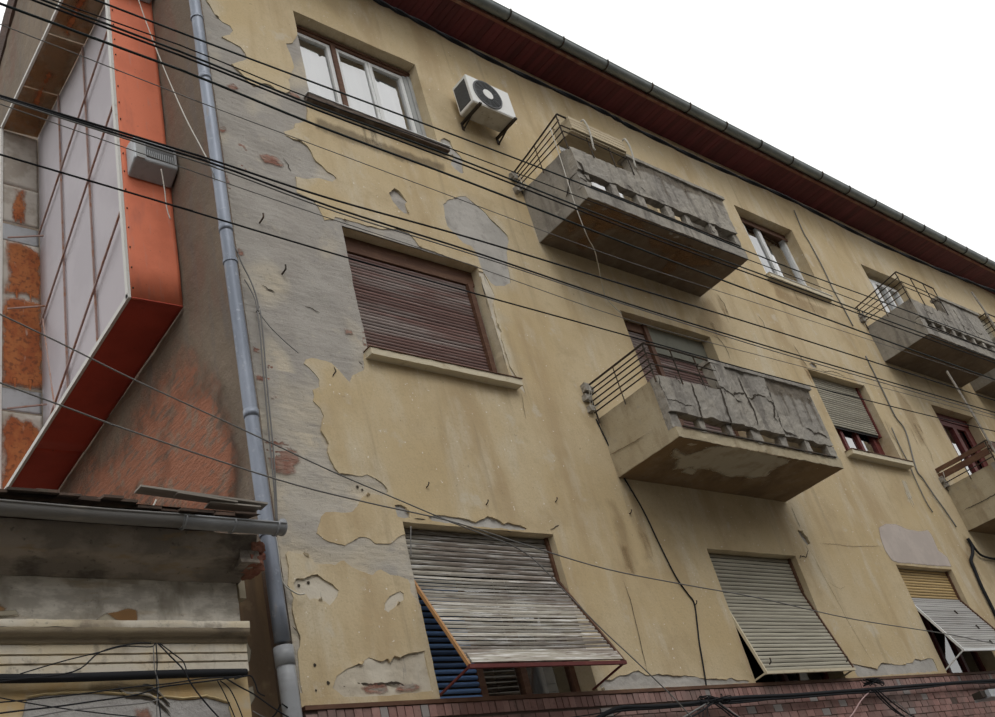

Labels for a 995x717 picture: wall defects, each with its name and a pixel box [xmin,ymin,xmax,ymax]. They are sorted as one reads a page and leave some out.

flaking render [440,139,463,173]
flaking render [201,0,450,697]
flaking render [429,515,526,530]
peeling [97,608,137,620]
flaking render [853,658,937,677]
flaking render [600,671,749,690]